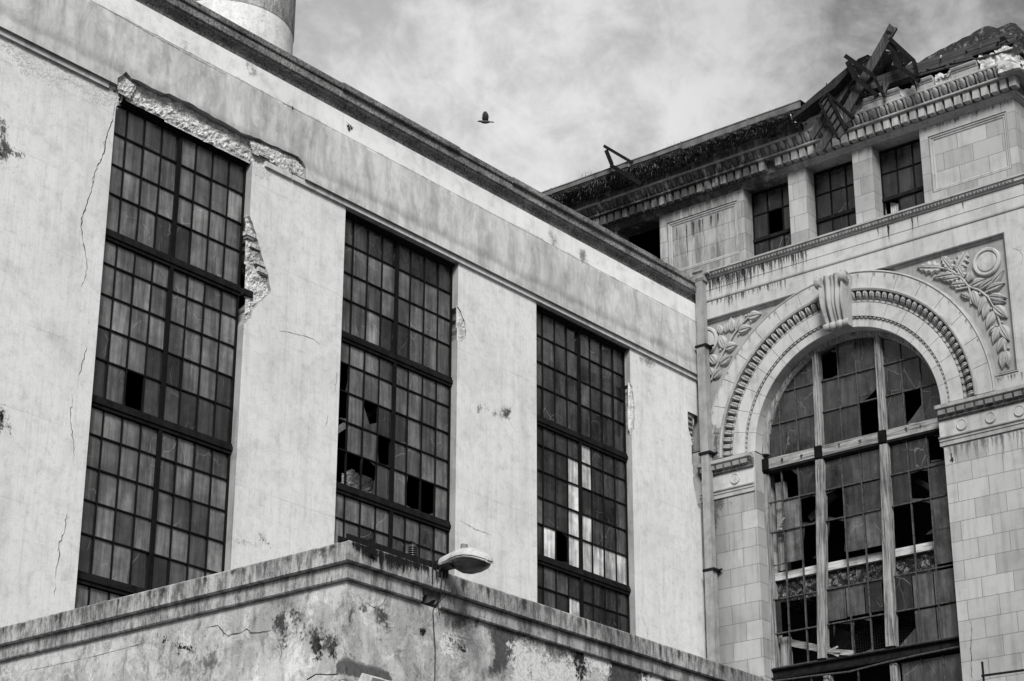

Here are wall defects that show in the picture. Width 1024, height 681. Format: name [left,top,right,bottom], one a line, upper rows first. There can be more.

spalling [0,40,304,180]
crack [81,88,117,287]
spalling [243,215,268,321]
leakage [709,250,807,302]
spalling [456,305,465,341]
crack [210,625,282,658]
leakage [271,597,339,660]
leakage [349,597,390,632]
leakage [444,610,591,681]
leakage [608,662,670,681]